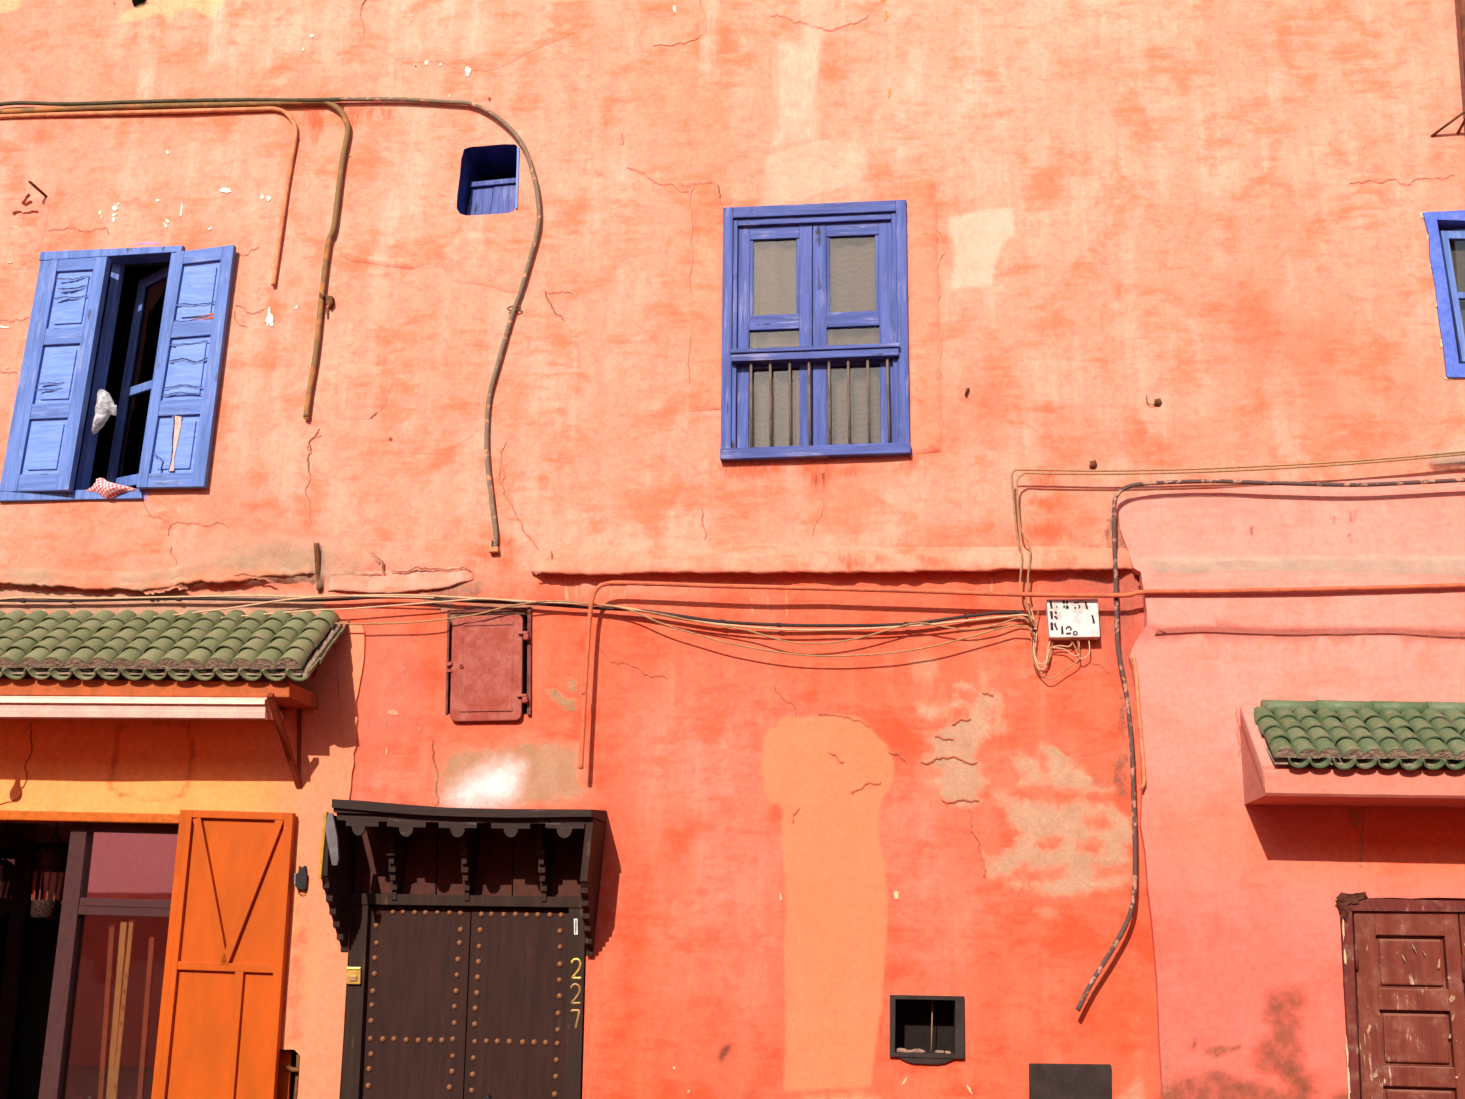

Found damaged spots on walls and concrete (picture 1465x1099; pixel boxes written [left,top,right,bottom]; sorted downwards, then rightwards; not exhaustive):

crack [358,0,366,34]
crack [653,0,723,46]
crack [153,301,264,472]
crack [304,428,322,524]
crack [143,502,229,595]
peeling [911,659,937,680]
crack [0,722,33,804]
crack [773,685,993,876]
peeling [917,675,1132,899]
damp [1120,985,1313,1099]